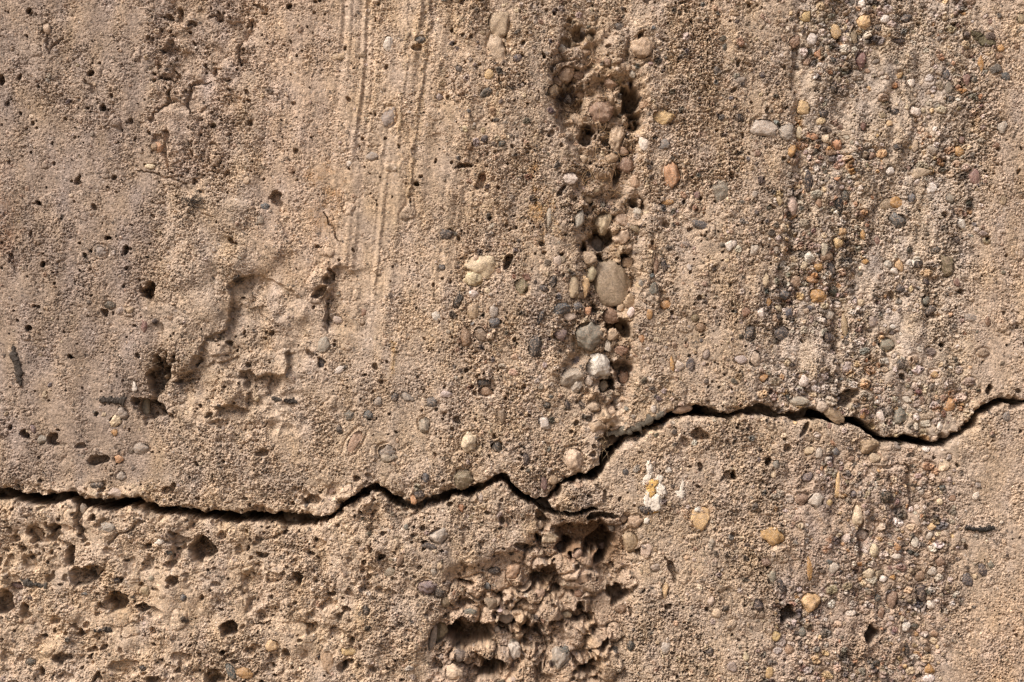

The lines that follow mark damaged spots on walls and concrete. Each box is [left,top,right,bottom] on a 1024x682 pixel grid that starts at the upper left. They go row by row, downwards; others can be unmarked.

crack [0,397,1024,547]
spalling [427,507,653,682]